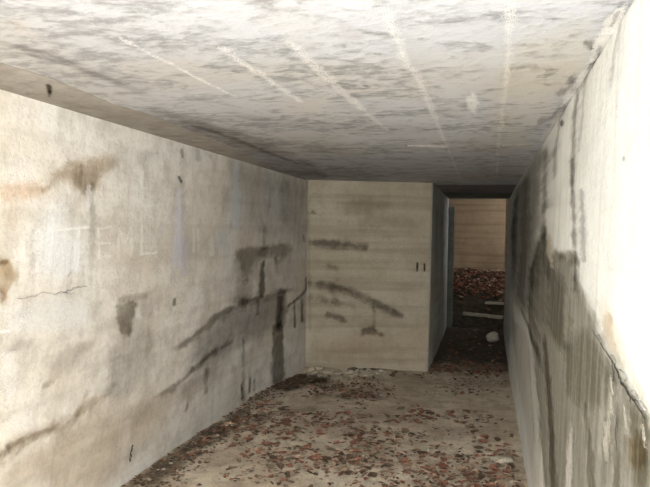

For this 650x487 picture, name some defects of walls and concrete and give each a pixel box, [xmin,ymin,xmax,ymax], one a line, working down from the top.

water stain [0,195,92,339]
crack [17,270,87,299]
water stain [273,329,327,391]
water stain [529,233,650,487]
crack [593,331,645,420]